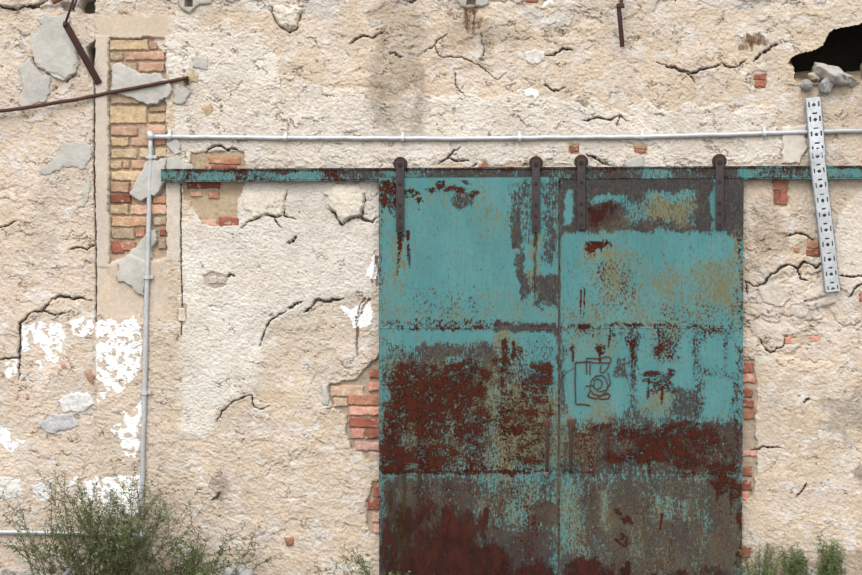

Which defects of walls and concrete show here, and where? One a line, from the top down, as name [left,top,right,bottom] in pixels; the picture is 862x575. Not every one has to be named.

crack [657,44,778,81]
spalling [106,37,168,263]
crack [1,74,97,380]
peeling [5,316,143,403]
crack [260,298,344,345]
corrosion [585,241,609,256]
corrosion [628,323,676,404]
crack [745,261,821,301]
peeling [110,400,142,458]
spalling [329,356,379,461]
corrosion [379,338,634,575]
corrosion [592,419,742,566]